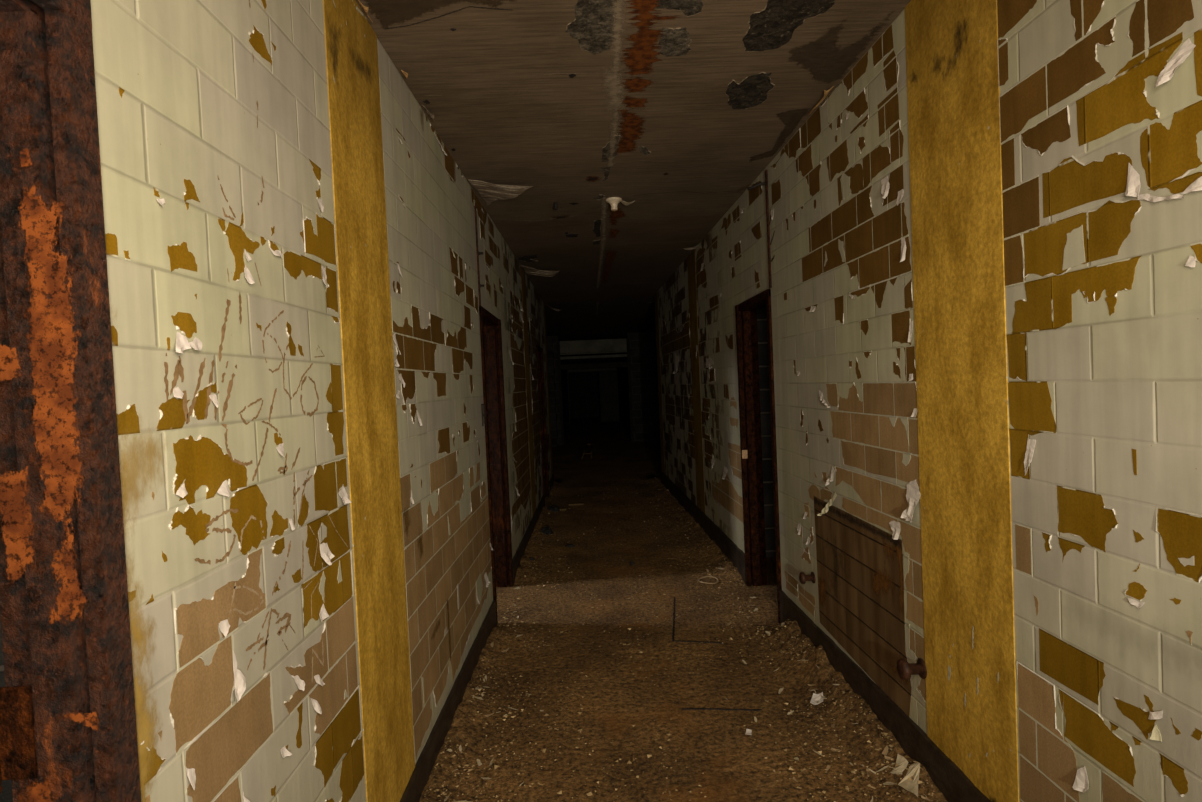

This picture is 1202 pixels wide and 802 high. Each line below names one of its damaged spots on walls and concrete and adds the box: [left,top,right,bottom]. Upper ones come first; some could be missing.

rust [617,0,679,153]
rust [20,148,32,167]
rust [0,185,87,624]
peeling [117,404,140,435]
peeling [167,242,197,272]
peeling [167,312,202,354]
peeling [141,364,364,802]
peeling [218,159,340,324]
peeling [392,188,531,762]
peeling [1015,485,1118,577]
peeling [1133,506,1202,583]
peeling [1017,596,1202,802]